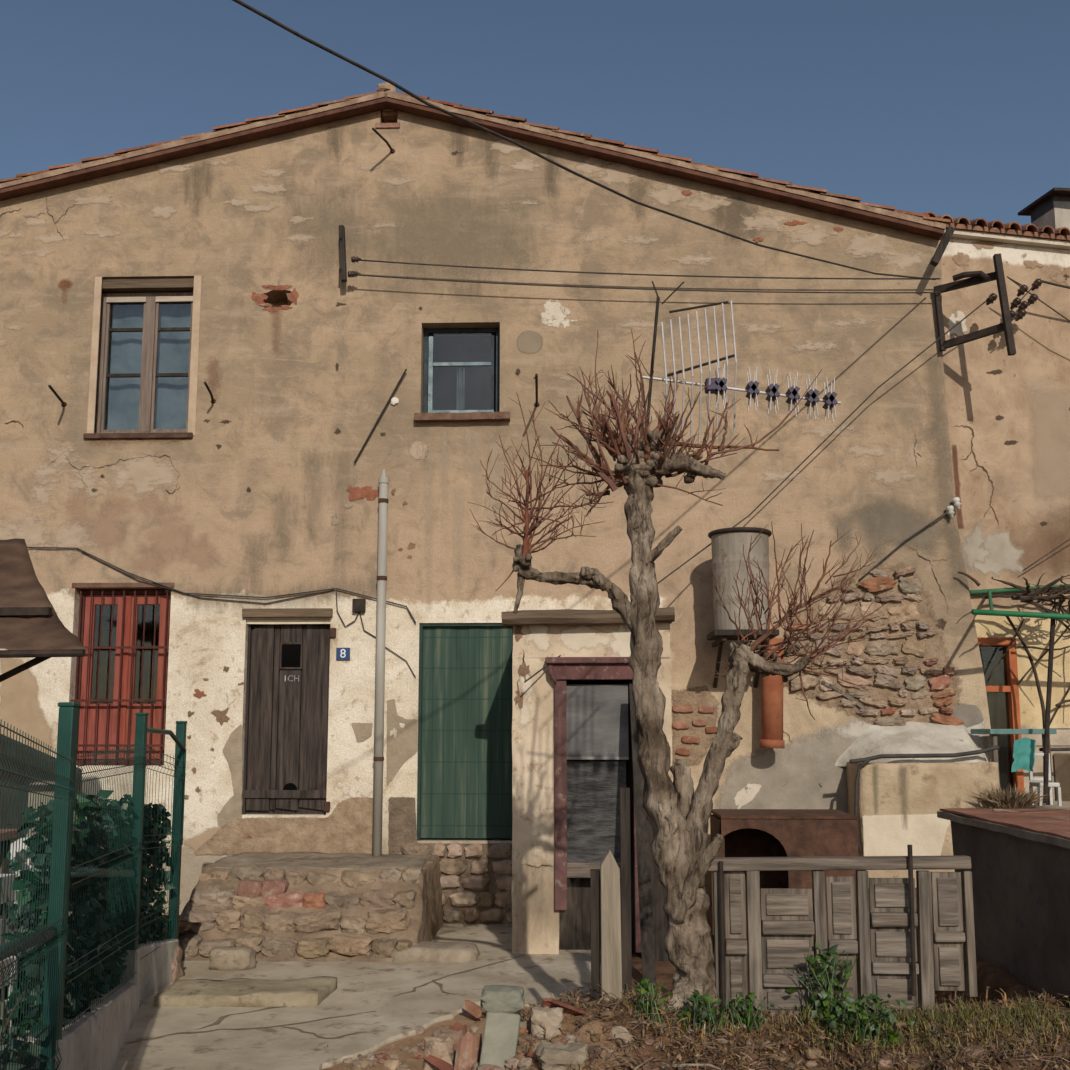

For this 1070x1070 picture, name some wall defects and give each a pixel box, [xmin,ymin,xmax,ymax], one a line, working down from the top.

crack [0,193,75,241]
spalling [251,285,299,312]
peeling [517,300,577,353]
flaking render [346,486,408,506]
crack [954,425,999,524]
peeling [961,524,1024,576]
leakage [1015,519,1070,572]
flaking render [717,564,987,813]
flaking render [672,686,719,765]
peeling [862,814,951,856]